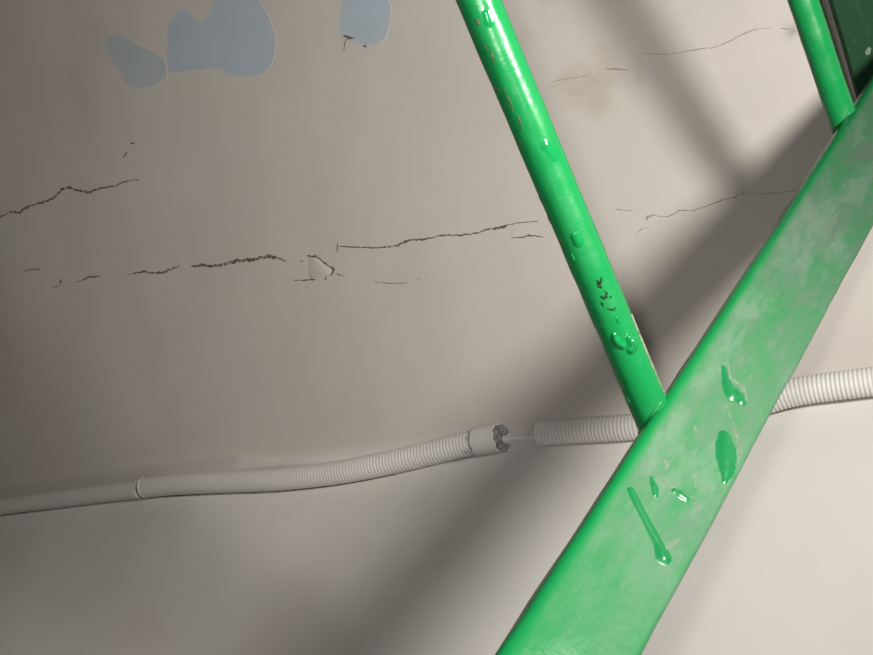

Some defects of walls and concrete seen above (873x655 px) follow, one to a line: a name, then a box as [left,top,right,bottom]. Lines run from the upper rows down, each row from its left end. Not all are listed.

peeling [105,0,276,89]
peeling [339,0,392,49]
crack [642,28,794,55]
crack [0,179,138,218]
crack [618,190,797,233]
crack [133,221,541,281]